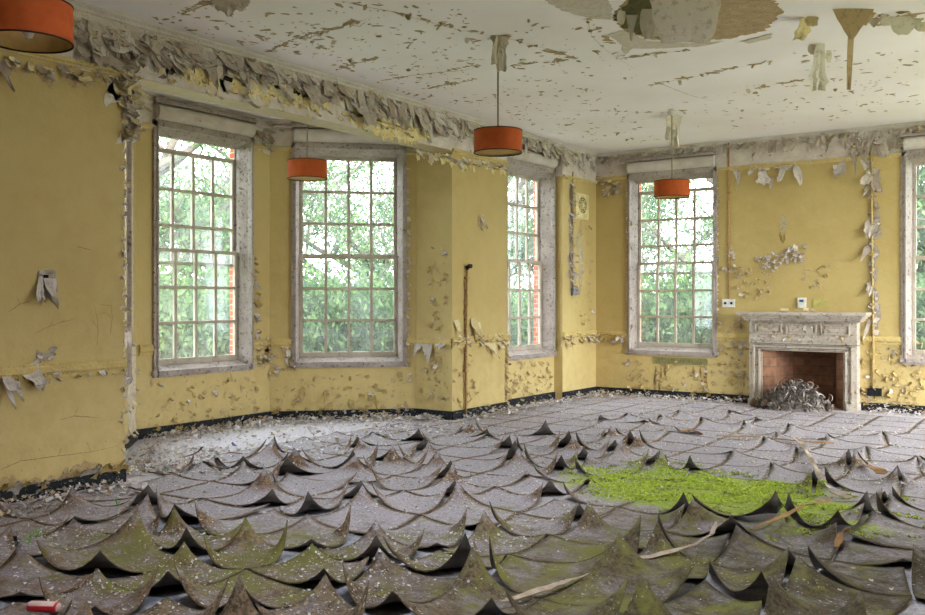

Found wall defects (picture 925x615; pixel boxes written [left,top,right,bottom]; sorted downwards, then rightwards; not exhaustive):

peeling [490,31,517,72]
peeling [507,19,607,142]
flaking render [545,0,784,55]
peeling [746,8,925,124]
flaking render [0,0,512,331]
peeling [0,339,141,495]
peeling [147,105,925,615]
peeling [0,443,345,615]